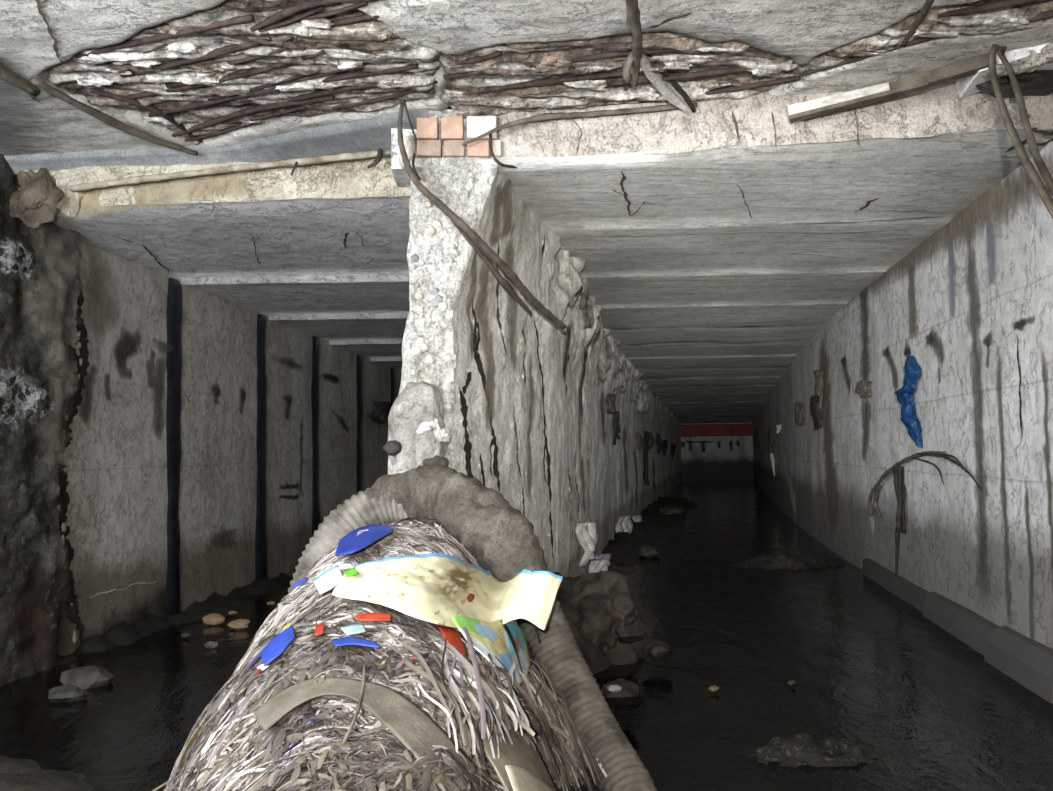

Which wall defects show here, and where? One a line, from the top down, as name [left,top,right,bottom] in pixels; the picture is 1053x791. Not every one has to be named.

crack [35,0,66,63]
crack [67,191,86,221]
spalling [31,0,1053,411]
leakage [0,368,55,426]
crack [56,249,90,647]
leakage [81,333,140,421]
leakage [147,342,173,435]
leakage [280,423,303,499]
crack [458,241,591,569]
leakage [820,343,838,522]
leakage [859,159,1053,614]
leakage [1025,488,1033,640]